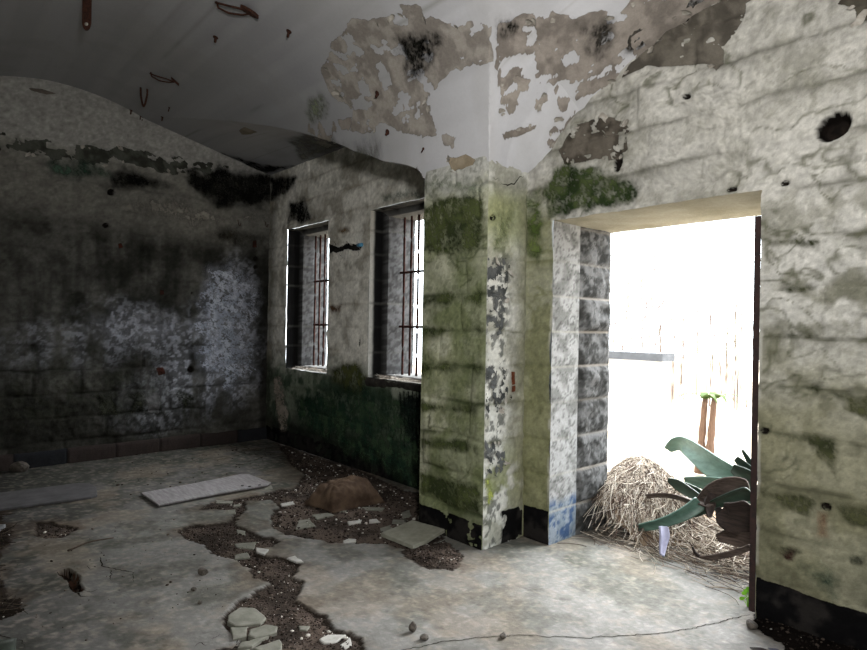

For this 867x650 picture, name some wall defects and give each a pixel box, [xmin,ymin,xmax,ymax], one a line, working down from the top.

flaking render [308,0,750,174]